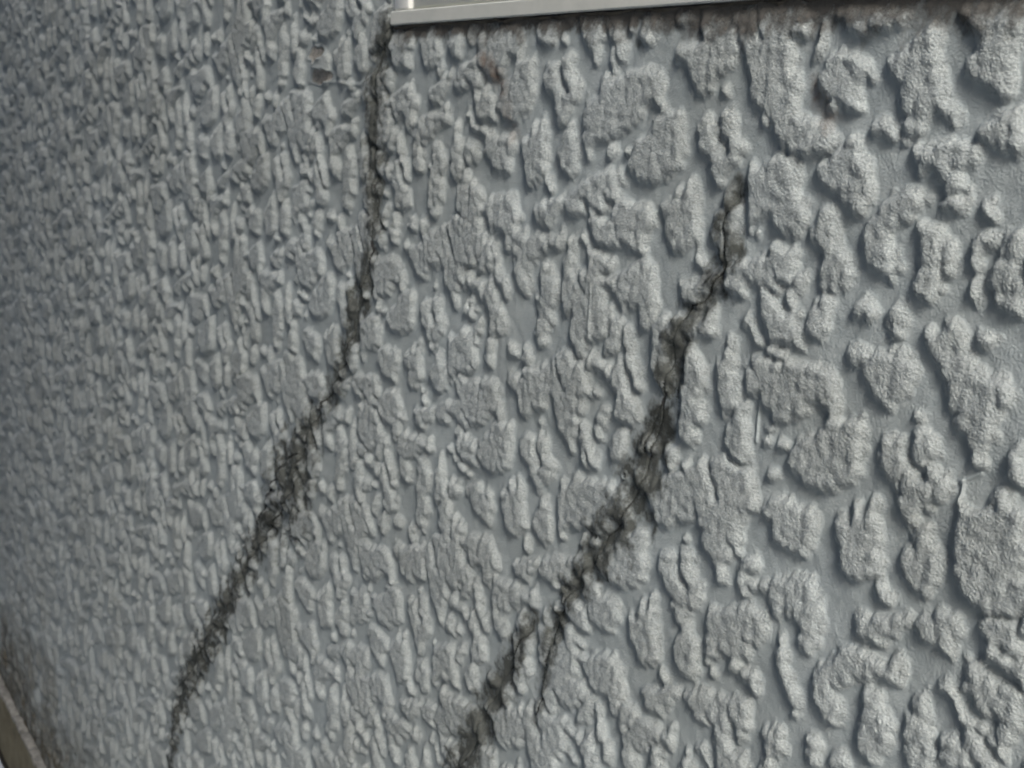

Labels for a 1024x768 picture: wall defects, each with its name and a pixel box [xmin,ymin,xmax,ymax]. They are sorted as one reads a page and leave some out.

crack [366,229,375,275]
crack [684,212,729,319]
crack [644,360,676,459]
crack [206,448,306,640]